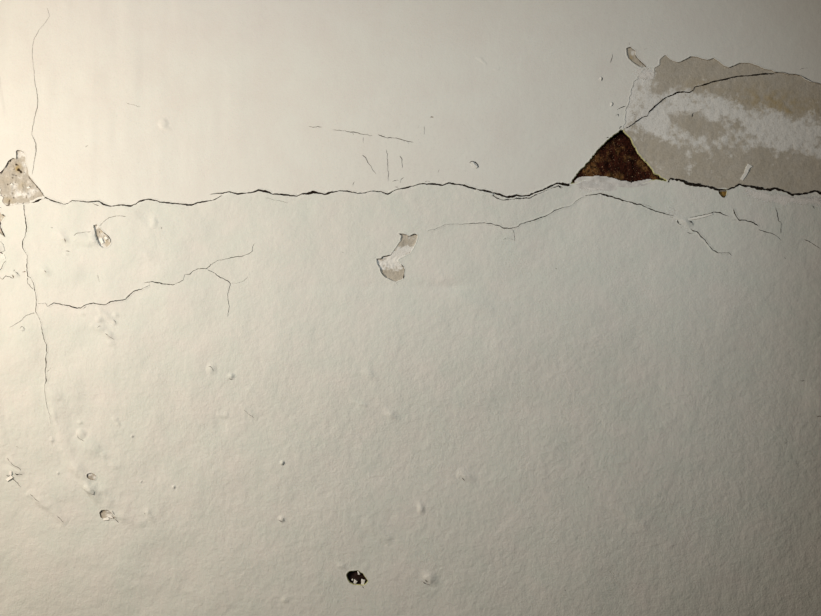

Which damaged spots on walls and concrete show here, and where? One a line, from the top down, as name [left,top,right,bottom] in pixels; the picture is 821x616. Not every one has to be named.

peeling [570,44,821,199]
crack [626,72,820,128]
peeling [0,149,45,259]
spalling [92,216,126,249]
spalling [375,232,419,283]
crack [0,178,821,424]
peeling [98,508,119,523]
spalling [345,569,369,587]